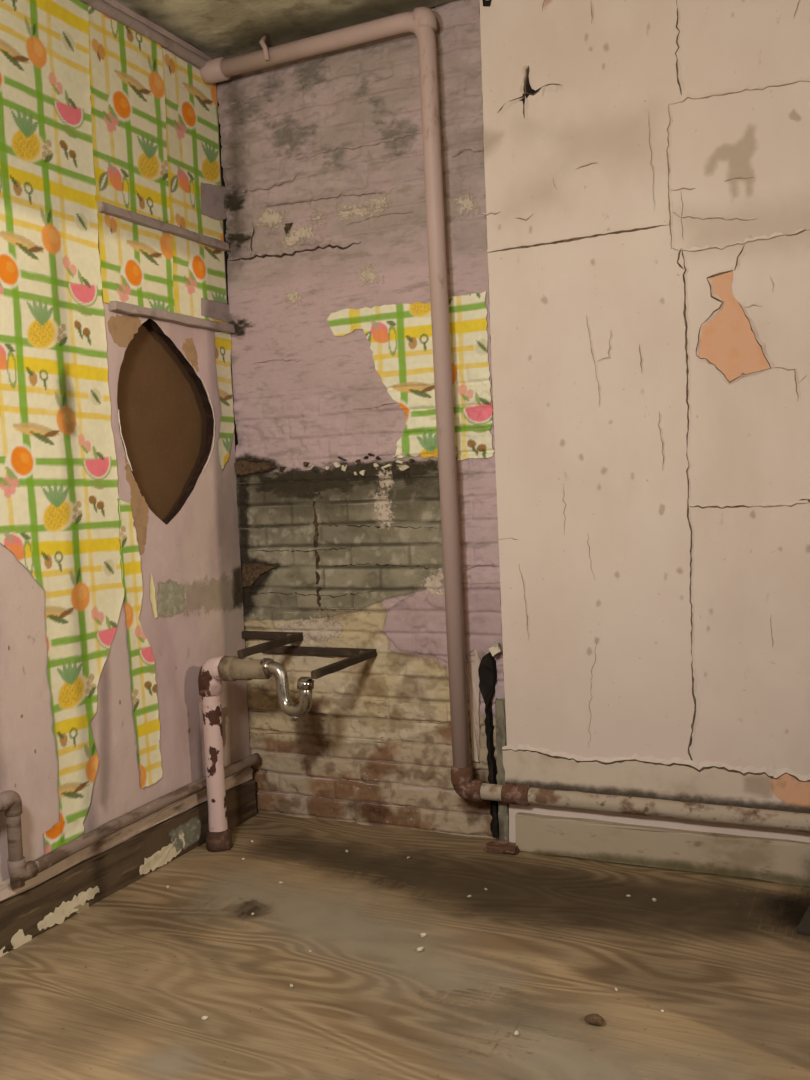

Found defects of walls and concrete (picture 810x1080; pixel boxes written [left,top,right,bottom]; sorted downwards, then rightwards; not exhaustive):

crack [229,133,421,261]
spalling [107,314,215,555]
crack [483,0,810,762]
peeling [695,267,775,385]
leakage [237,477,253,618]
peeling [466,643,810,808]
peeling [139,833,185,875]
corrosion [462,799,490,815]
peeling [0,886,100,957]